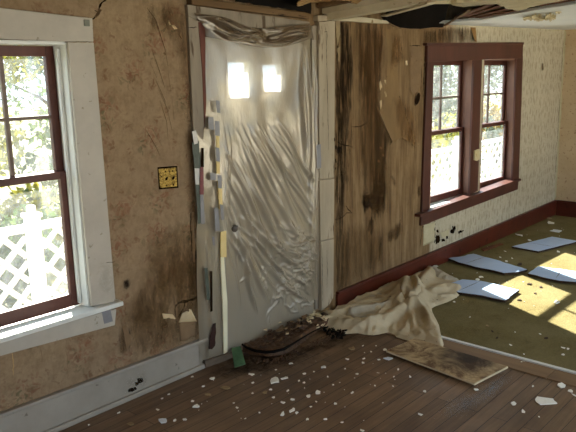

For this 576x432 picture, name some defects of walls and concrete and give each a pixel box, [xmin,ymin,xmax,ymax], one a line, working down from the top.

crack [92,0,106,20]
leakage [335,22,388,284]